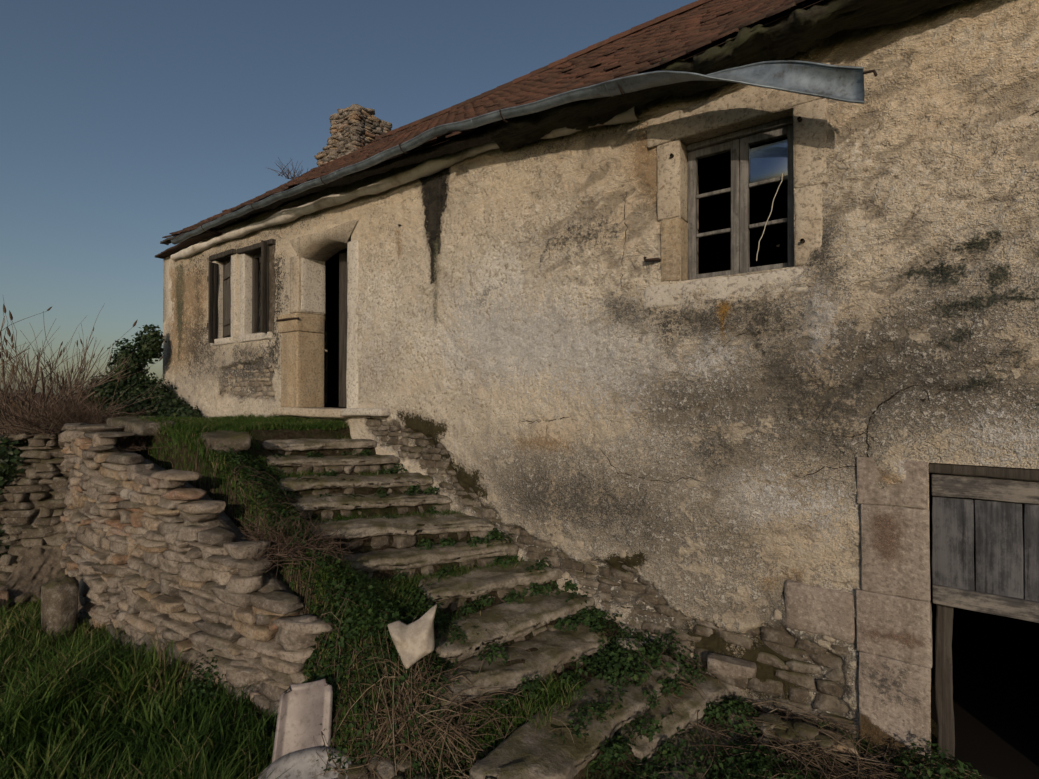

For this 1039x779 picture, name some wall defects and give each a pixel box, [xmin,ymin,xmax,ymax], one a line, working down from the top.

leakage [418,168,451,318]
leakage [530,211,620,266]
spalling [218,352,275,403]
leakage [449,220,952,459]
crack [797,385,956,478]
spalling [360,417,859,733]